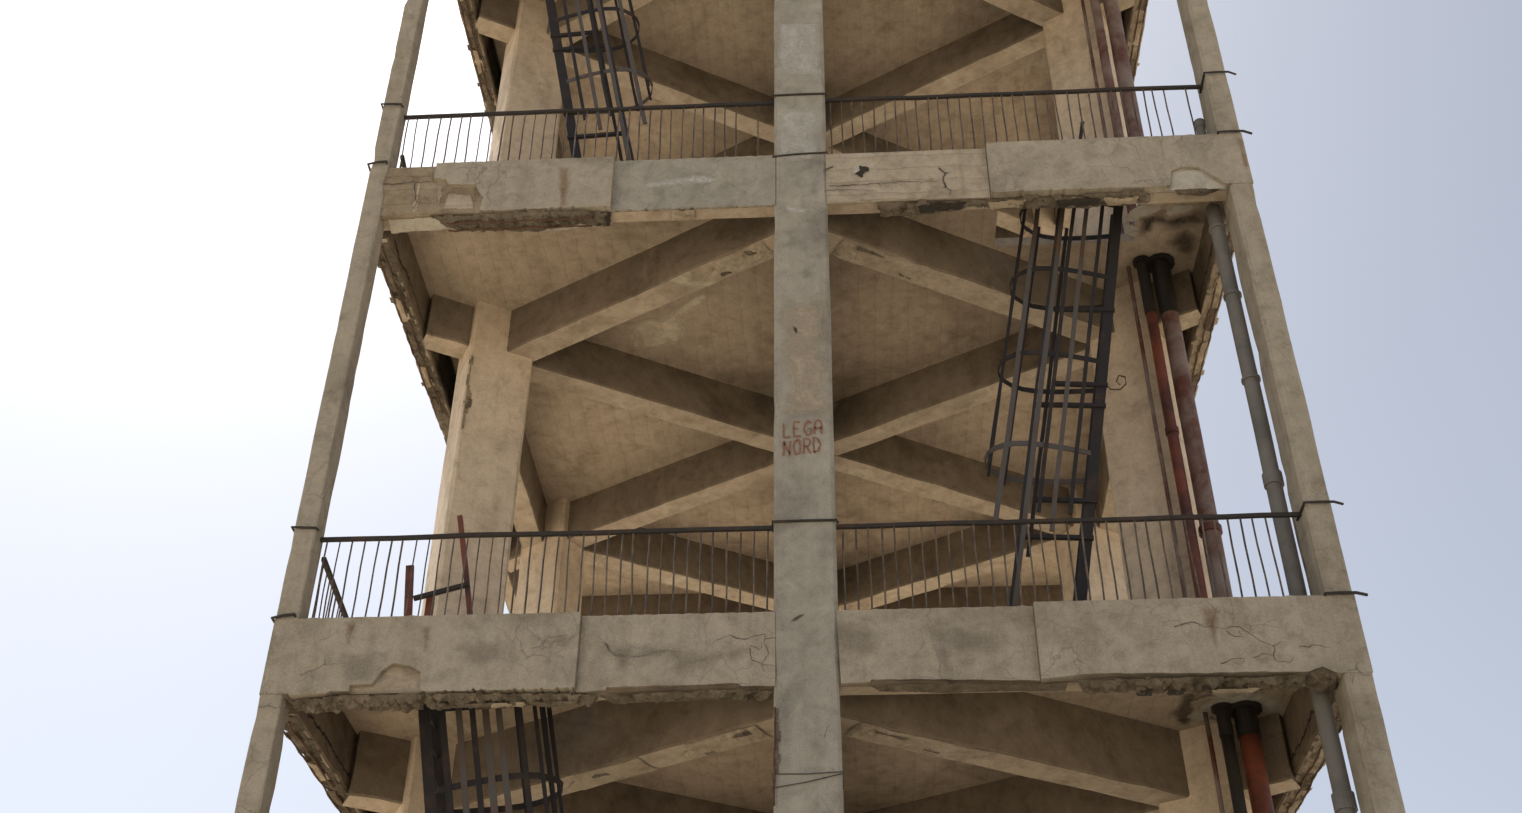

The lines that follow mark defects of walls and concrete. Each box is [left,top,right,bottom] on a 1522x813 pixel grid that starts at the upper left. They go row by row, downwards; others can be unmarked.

flaking render [826,151,1224,237]
flaking render [377,168,611,445]
crack [604,634,774,670]
crack [1174,621,1371,685]
spalling [1078,667,1342,733]
spalling [284,667,781,813]
flaking render [845,723,992,762]
spalling [1279,735,1326,813]